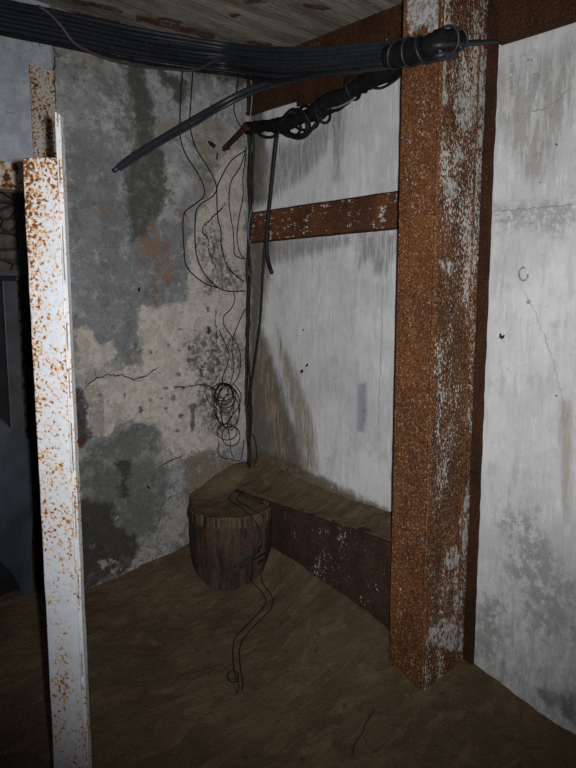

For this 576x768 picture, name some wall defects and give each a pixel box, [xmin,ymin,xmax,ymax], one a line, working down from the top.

damp [158,70,188,105]
damp [120,64,178,241]
damp [252,112,340,204]
mould [196,224,239,295]
crack [85,366,159,387]
damp [76,238,388,589]
damp [510,518,574,633]